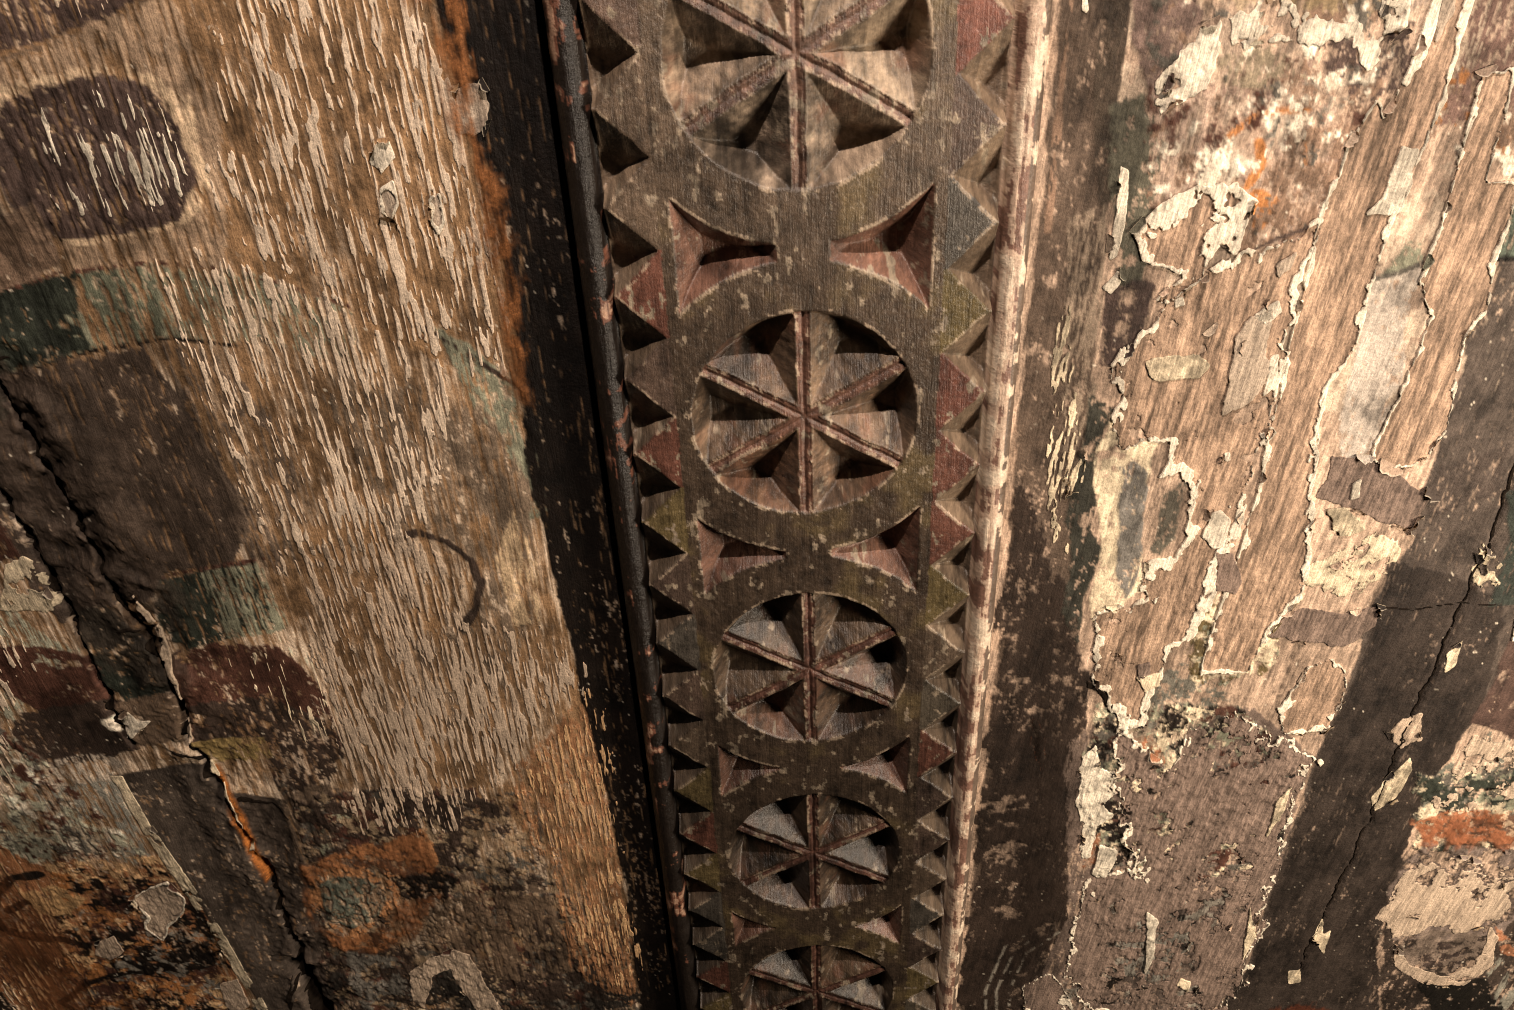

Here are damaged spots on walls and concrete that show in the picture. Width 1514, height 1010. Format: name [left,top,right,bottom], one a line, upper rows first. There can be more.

peeling [0,556,65,805]
crack [0,356,334,1010]
peeling [1021,0,1514,1010]
crack [1300,466,1514,971]